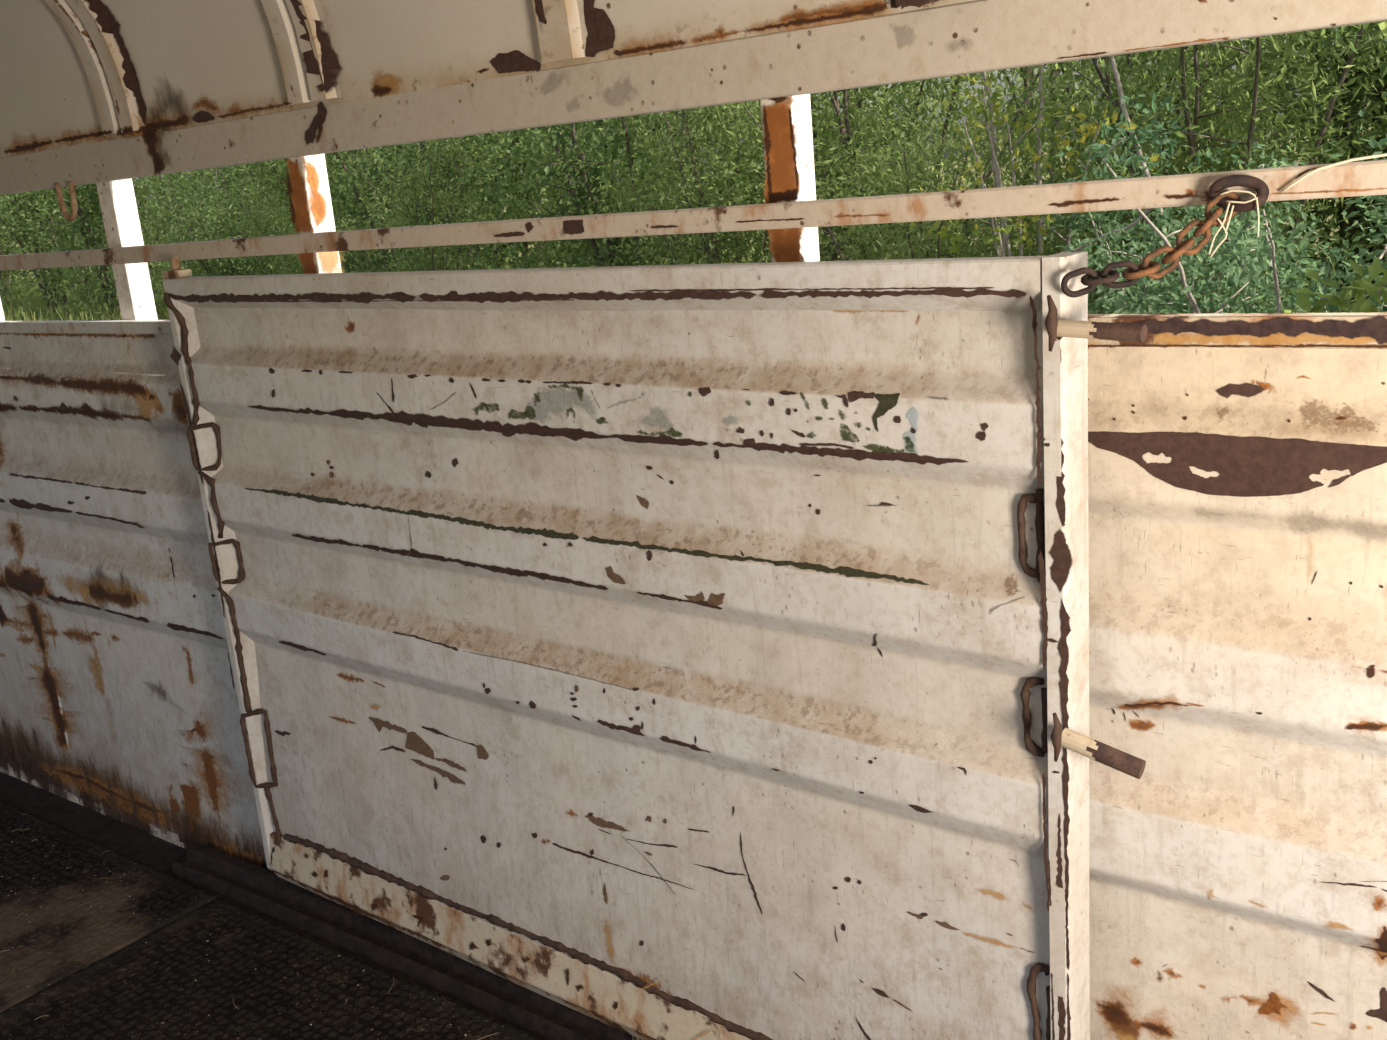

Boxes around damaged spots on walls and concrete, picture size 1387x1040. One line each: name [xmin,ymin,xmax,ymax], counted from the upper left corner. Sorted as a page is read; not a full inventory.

peeling [290,0,342,145]
corrosion [621,0,887,54]
corrosion [4,90,292,175]
corrosion [737,97,805,262]
corrosion [1088,333,1387,349]
peeling [1119,315,1387,345]
peeling [248,367,967,465]
peeling [1029,295,1073,730]
peeling [1088,431,1387,497]
corrosion [0,521,491,952]
peeling [1042,747,1071,1040]
corrosion [1098,1002,1172,1040]